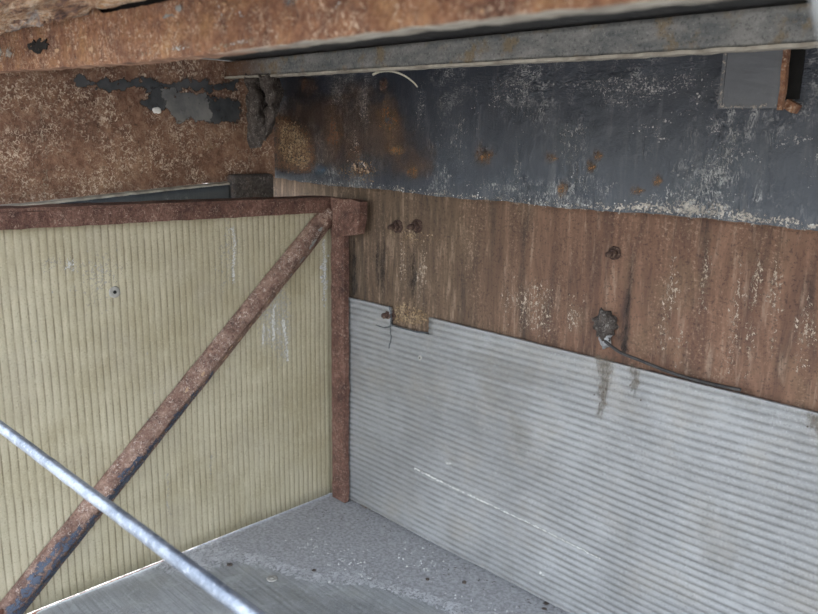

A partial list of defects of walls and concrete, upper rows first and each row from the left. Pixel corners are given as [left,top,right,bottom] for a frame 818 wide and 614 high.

leakage [544,68,712,115]
rust [274,115,320,174]
leakage [646,113,761,220]